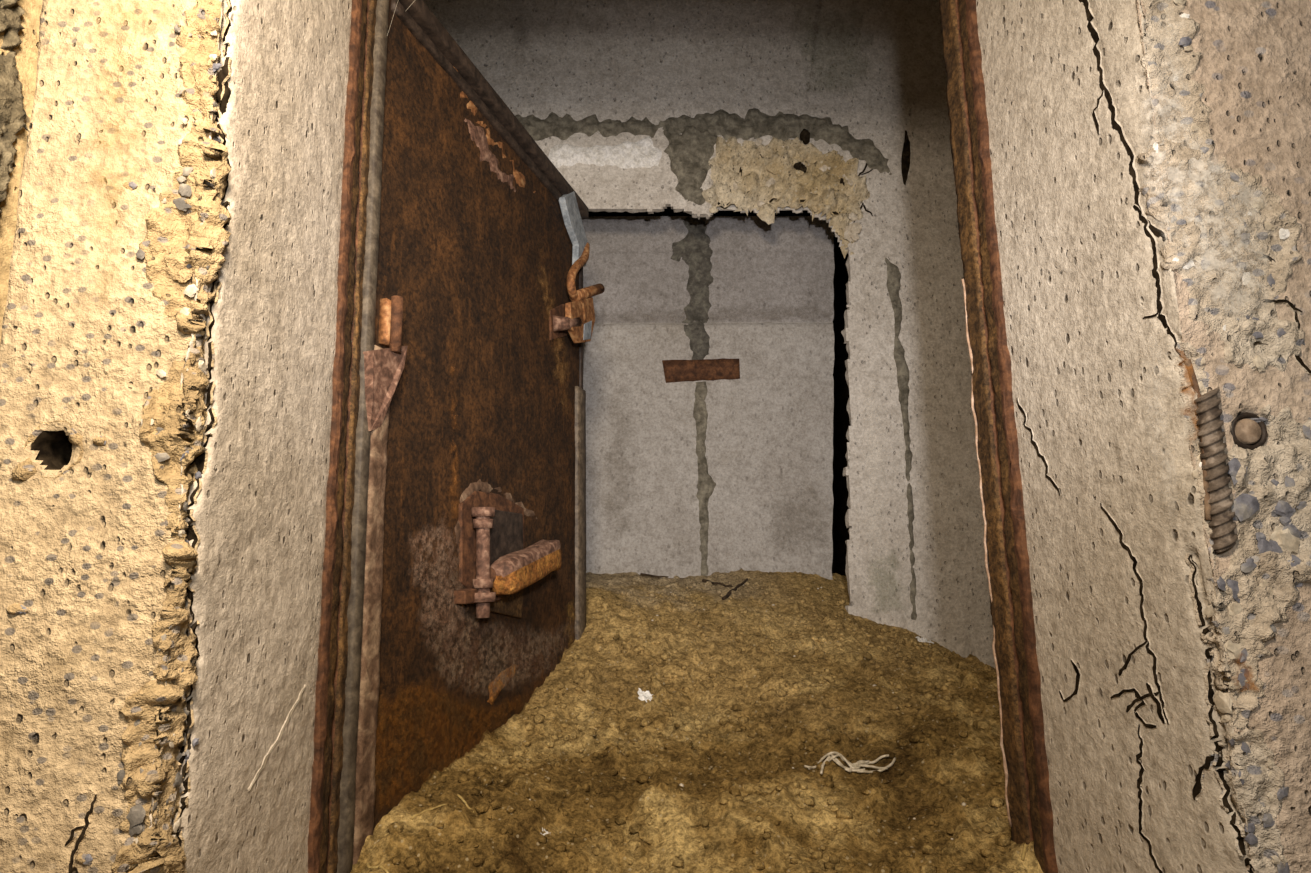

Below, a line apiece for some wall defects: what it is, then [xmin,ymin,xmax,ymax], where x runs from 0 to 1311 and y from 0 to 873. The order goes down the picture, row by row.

flaking render [548,136,662,169]
spalling [702,129,870,259]
crack [1079,0,1186,363]
peeling [68,433,107,447]
spalling [111,0,231,873]
crack [1016,398,1061,496]
crack [1059,659,1082,703]
crack [1100,503,1170,873]
crack [1185,553,1259,873]
crack [64,794,99,873]
spalling [75,853,93,865]